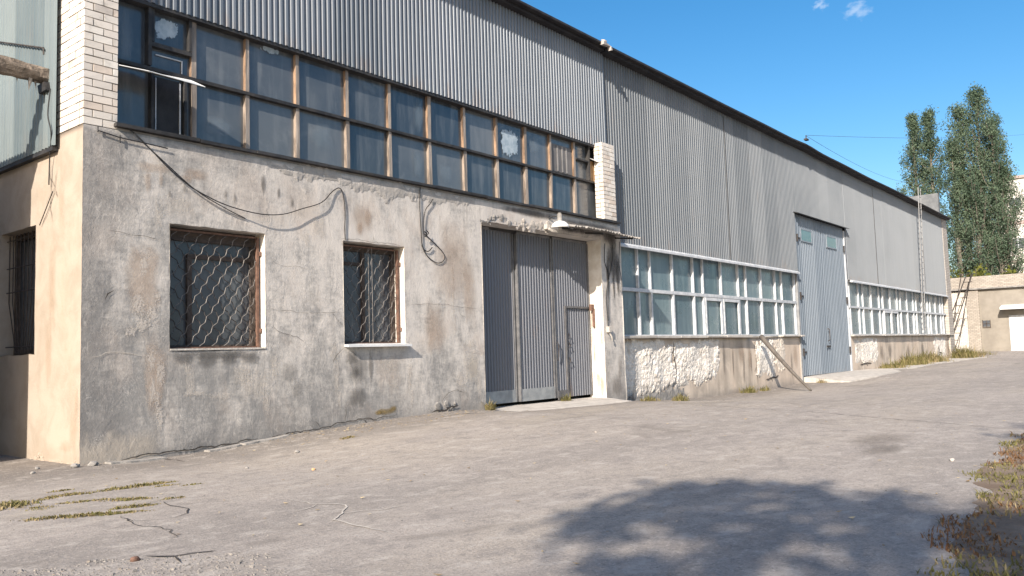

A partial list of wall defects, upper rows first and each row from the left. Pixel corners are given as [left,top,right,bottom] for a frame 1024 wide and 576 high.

spalling [268,163,475,206]
spalling [479,214,551,235]
spalling [625,338,720,401]
spalling [754,337,786,377]
spalling [854,338,879,364]
crack [121,415,395,461]